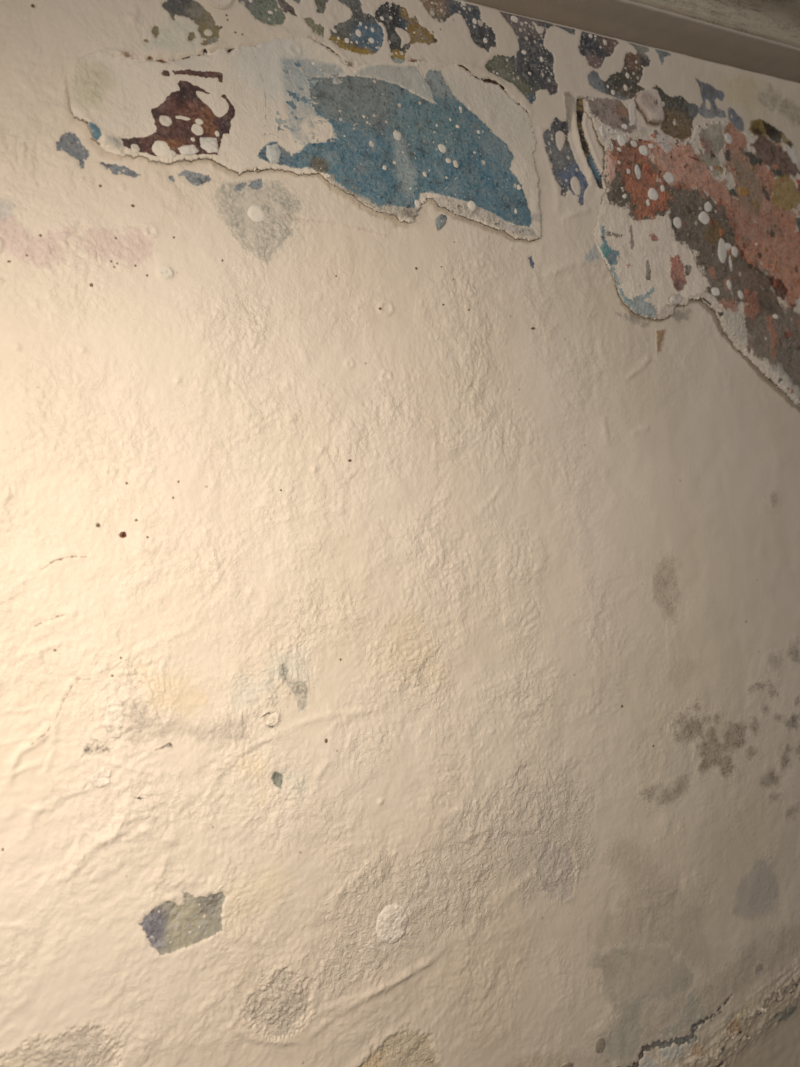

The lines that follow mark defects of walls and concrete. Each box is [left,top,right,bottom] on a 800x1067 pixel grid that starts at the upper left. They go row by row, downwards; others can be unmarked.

flaking render [56,0,800,409]
leakage [362,596,462,711]
leakage [469,631,800,1067]
spalling [138,891,226,956]
crack [617,977,800,1067]